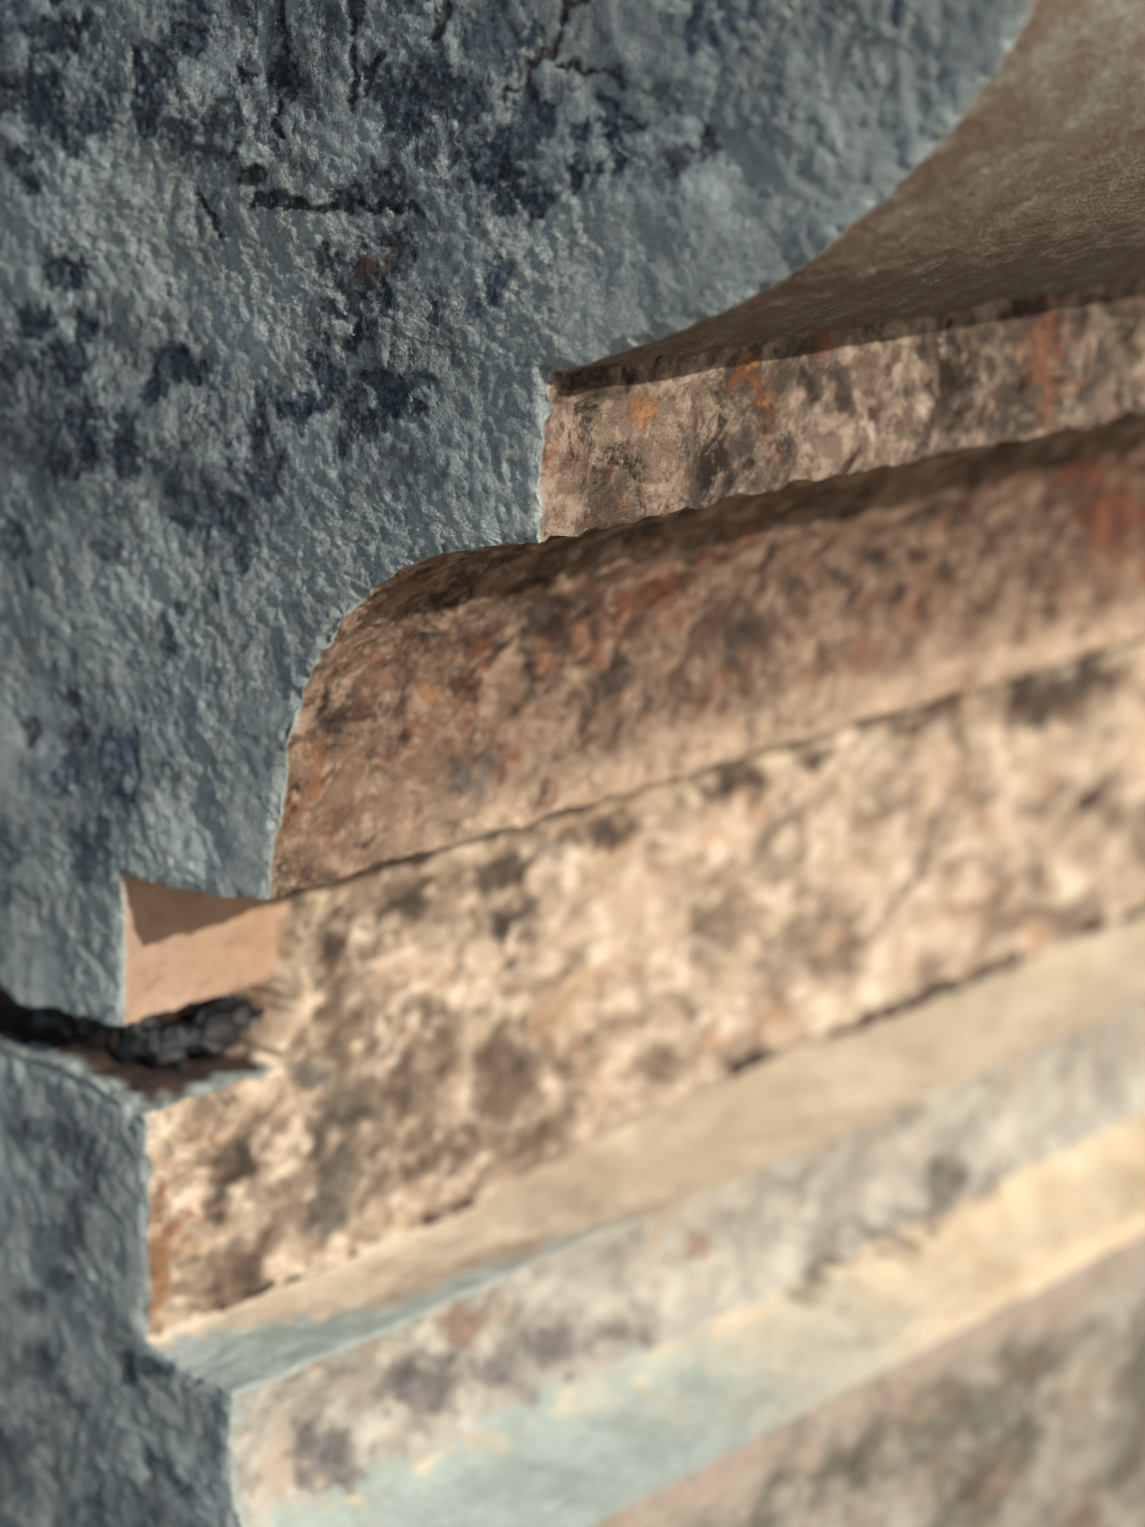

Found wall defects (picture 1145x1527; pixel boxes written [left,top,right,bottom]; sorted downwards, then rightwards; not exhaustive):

rust [352,243,400,286]
rust [554,366,658,430]
rust [834,365,874,442]
rust [913,354,932,417]
water stain [517,594,600,664]
rust [590,650,631,697]
water stain [700,765,768,805]
water stain [802,744,845,774]
water stain [559,807,638,853]
water stain [371,877,432,952]
water stain [469,852,542,971]
rust [148,1183,192,1324]